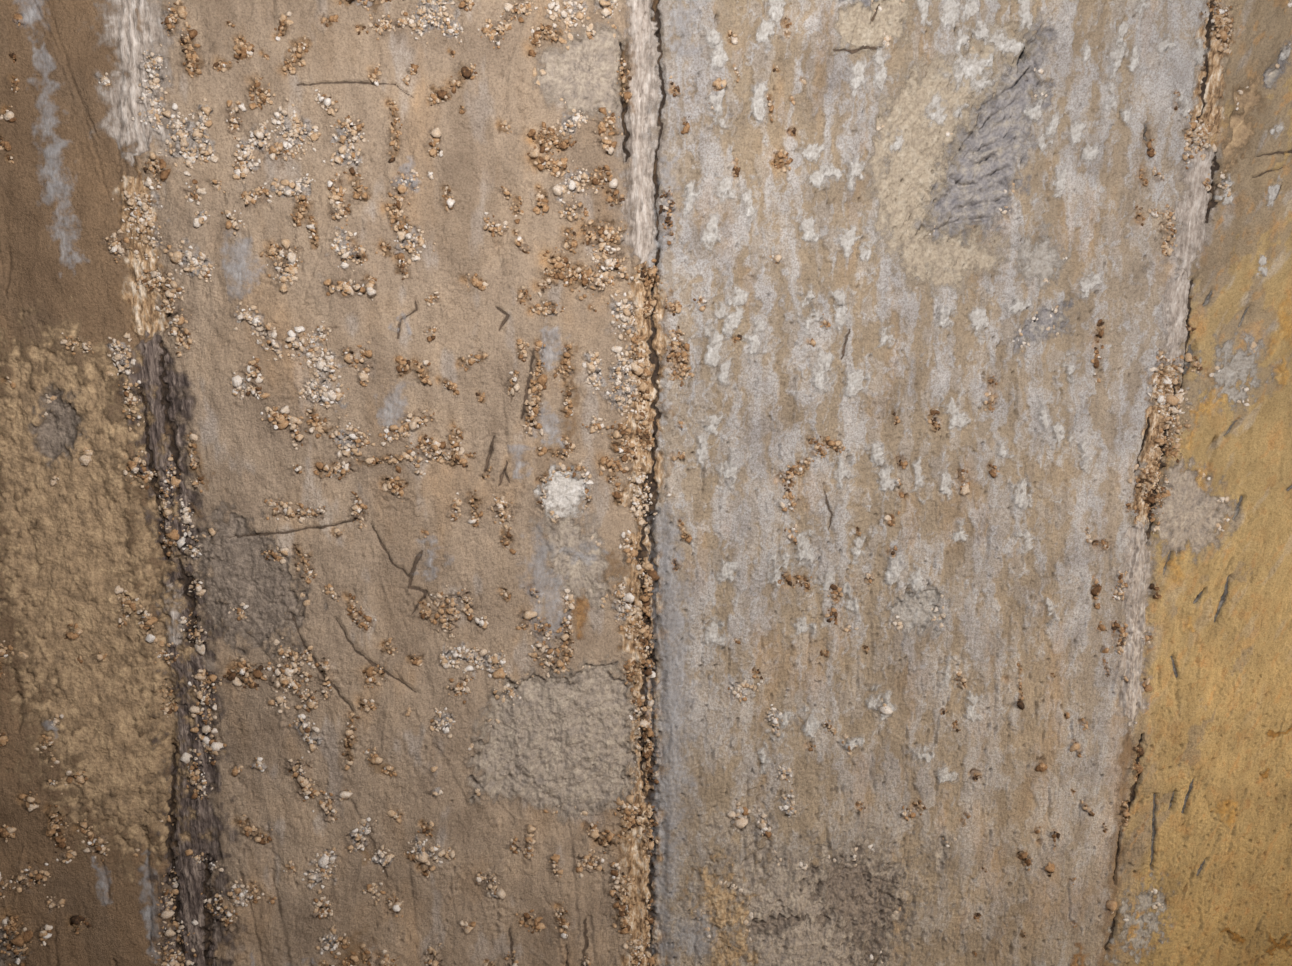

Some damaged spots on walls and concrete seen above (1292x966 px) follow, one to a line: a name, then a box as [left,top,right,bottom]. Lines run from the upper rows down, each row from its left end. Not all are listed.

damp [0,53,20,122]
crack [496,307,510,331]
crack [98,0,434,966]
crack [566,0,707,966]
crack [1104,0,1292,950]
damp [766,704,783,737]
damp [727,765,797,838]
crack [507,928,515,965]